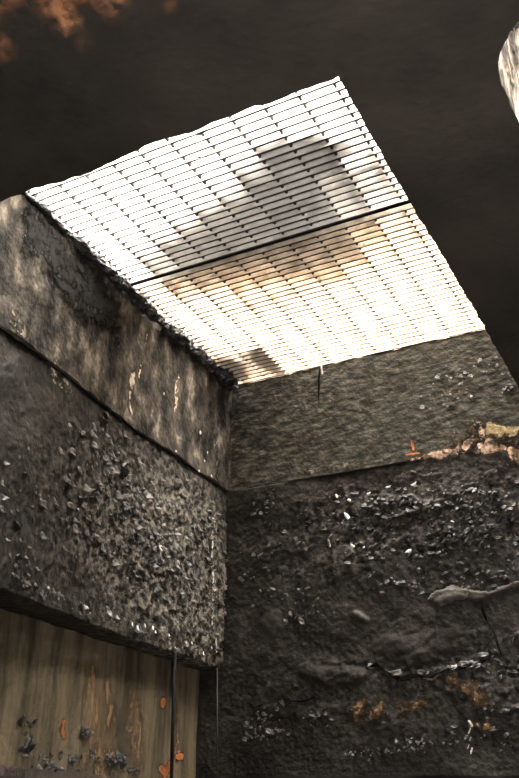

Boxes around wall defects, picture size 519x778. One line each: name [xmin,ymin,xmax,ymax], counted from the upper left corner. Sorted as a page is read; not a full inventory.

peeling [283,587,319,625]
peeling [292,421,519,607]